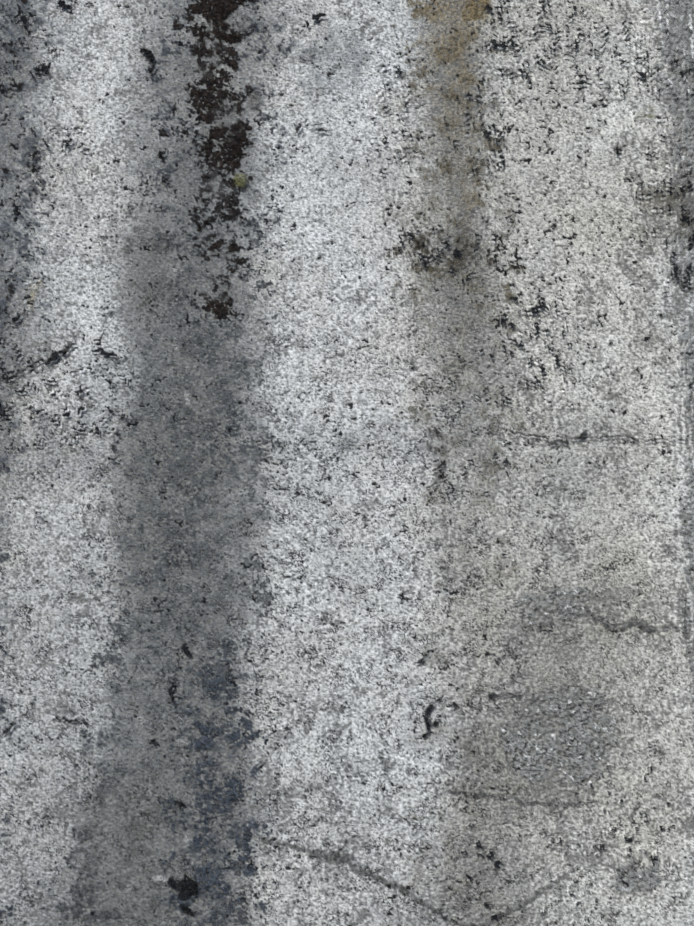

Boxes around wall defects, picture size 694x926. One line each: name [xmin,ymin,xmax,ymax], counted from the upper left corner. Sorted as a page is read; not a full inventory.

water stain [0,0,63,338]
water stain [404,133,452,182]
water stain [468,123,506,205]
water stain [387,196,525,343]
water stain [55,0,294,926]
crack [510,430,684,445]